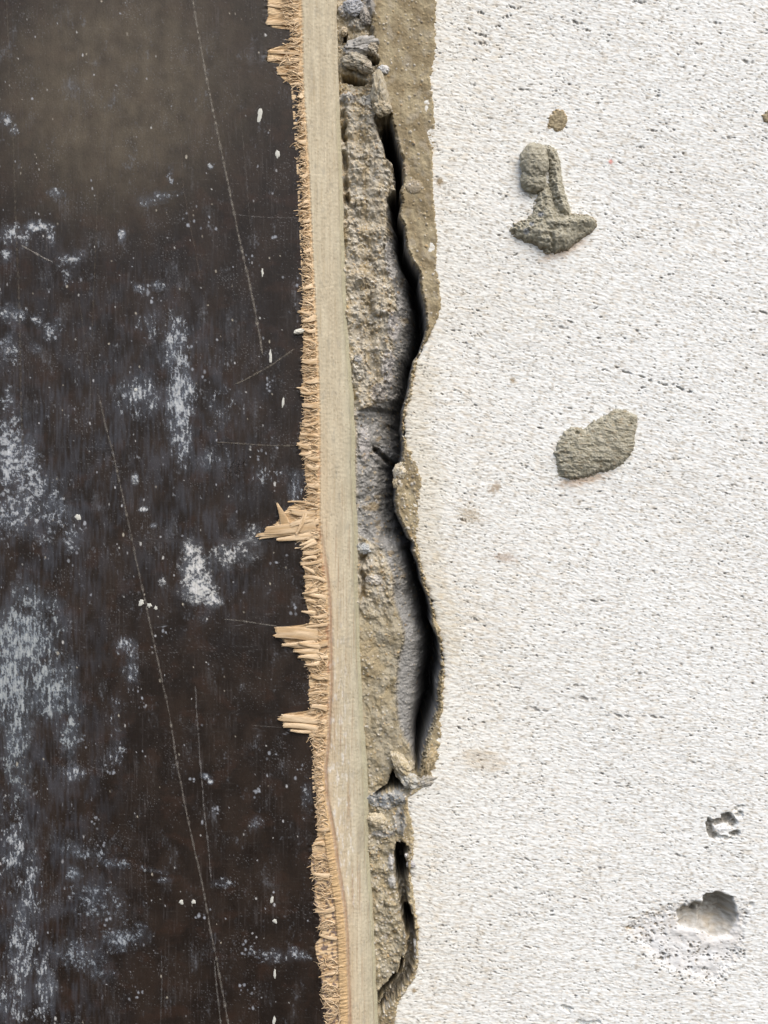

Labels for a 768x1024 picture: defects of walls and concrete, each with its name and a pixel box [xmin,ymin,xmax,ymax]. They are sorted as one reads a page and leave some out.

leakage [0,219,55,259]
leakage [1,308,56,339]
leakage [0,386,82,550]
leakage [118,317,198,469]
crack [354,112,445,789]
leakage [180,525,260,605]
leakage [0,589,141,1021]
spalling [700,802,748,847]
crack [377,840,418,1016]
spalling [615,892,761,992]